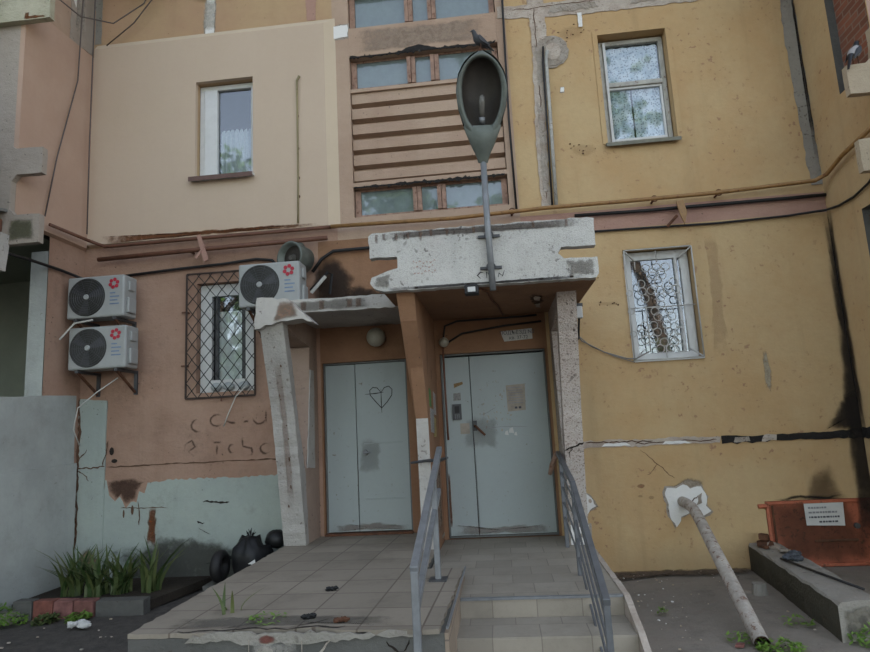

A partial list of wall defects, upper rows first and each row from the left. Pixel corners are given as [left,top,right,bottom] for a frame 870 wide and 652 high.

peeling [110,480,141,518]
crack [74,399,276,549]
crack [565,439,714,477]
water stain [780,225,870,555]